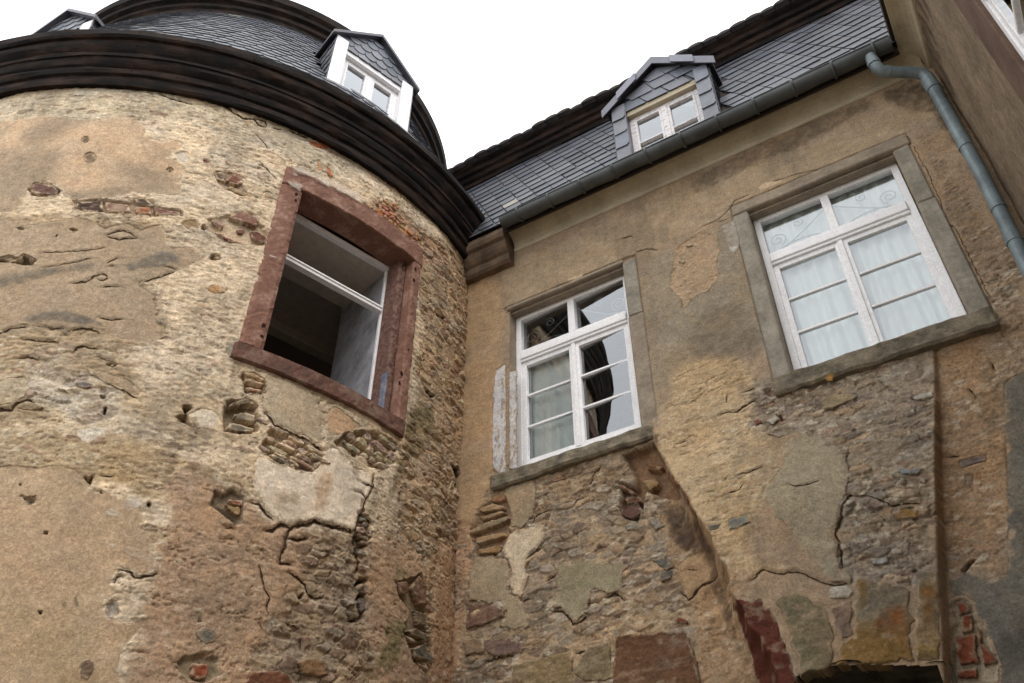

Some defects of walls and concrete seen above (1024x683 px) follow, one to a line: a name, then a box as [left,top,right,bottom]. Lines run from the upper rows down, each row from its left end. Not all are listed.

flaking render [0,114,269,246]
flaking render [210,370,399,551]
crack [250,472,374,648]
spalling [340,578,368,623]
peeling [492,365,518,473]
flaking render [463,493,701,683]
spalling [618,441,681,531]
flaking render [652,552,715,594]
flaking render [708,515,750,530]
flaking render [753,415,852,584]
crack [750,494,920,587]
flaking render [247,657,328,683]